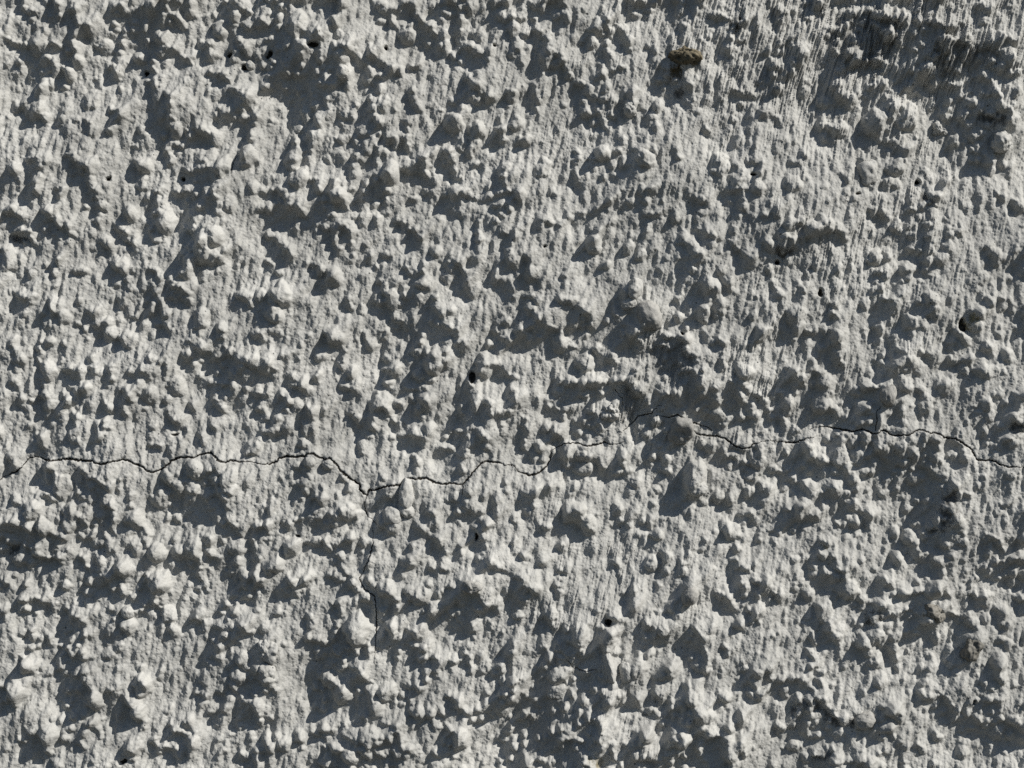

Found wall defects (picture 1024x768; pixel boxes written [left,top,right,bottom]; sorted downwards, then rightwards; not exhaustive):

crack [0,390,1024,650]